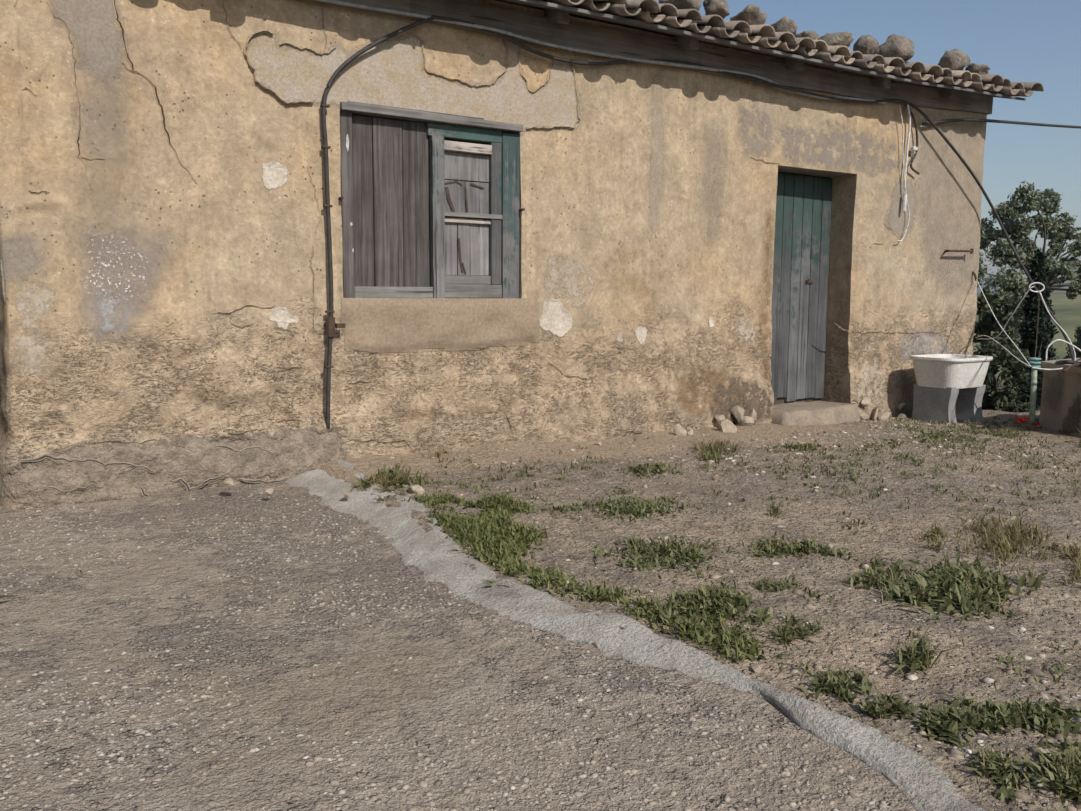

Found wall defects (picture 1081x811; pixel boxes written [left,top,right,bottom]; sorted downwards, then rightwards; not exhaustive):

crack [46,0,197,189]
flaking render [243,31,580,135]
peeling [262,161,288,190]
leakage [79,235,162,332]
crack [212,304,274,329]
peeling [269,307,299,330]
peeling [540,298,572,337]
crack [225,419,305,435]
crack [80,438,176,446]